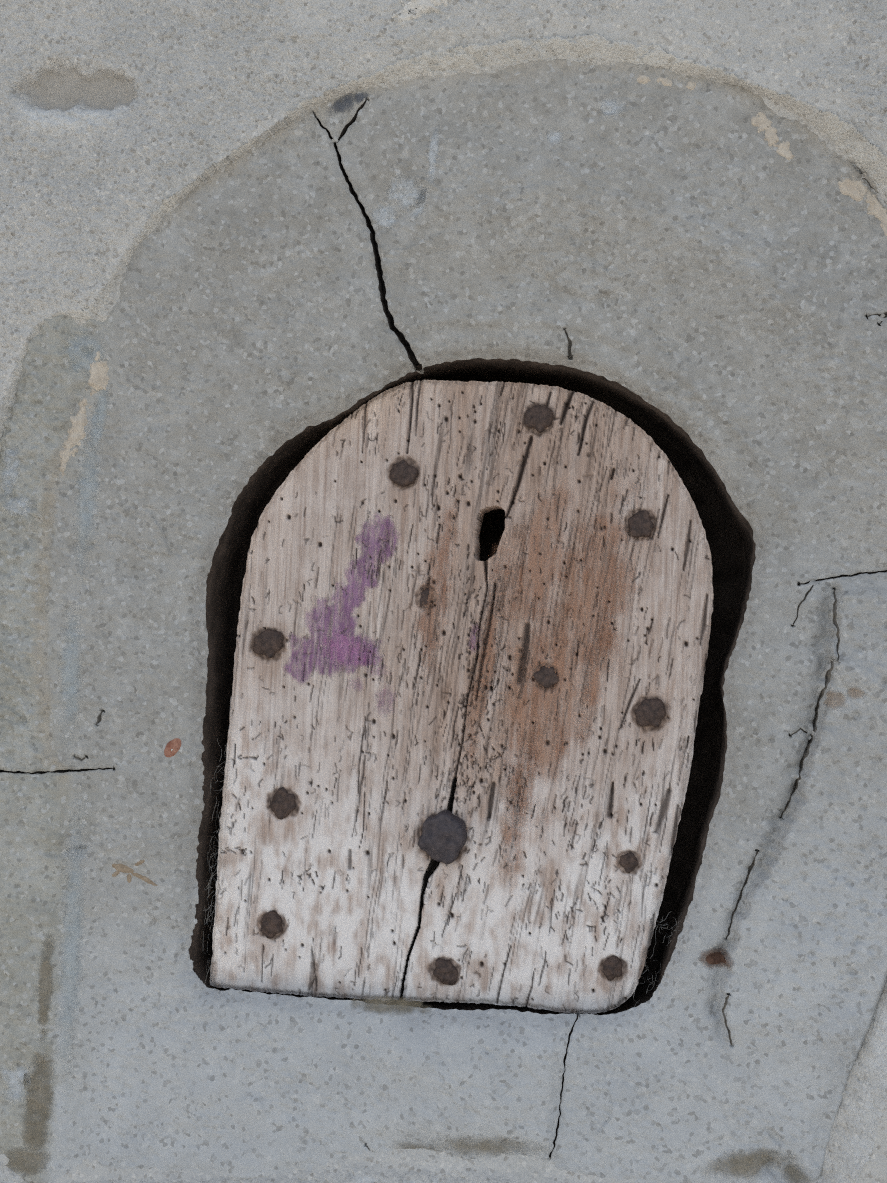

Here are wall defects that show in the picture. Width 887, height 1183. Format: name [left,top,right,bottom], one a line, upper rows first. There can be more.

crack [308,98,423,370]
crack [94,711,105,726]
crack [777,567,887,820]
crack [0,754,115,778]
crack [723,850,761,939]
crack [718,993,736,1045]
crack [544,1013,581,1161]